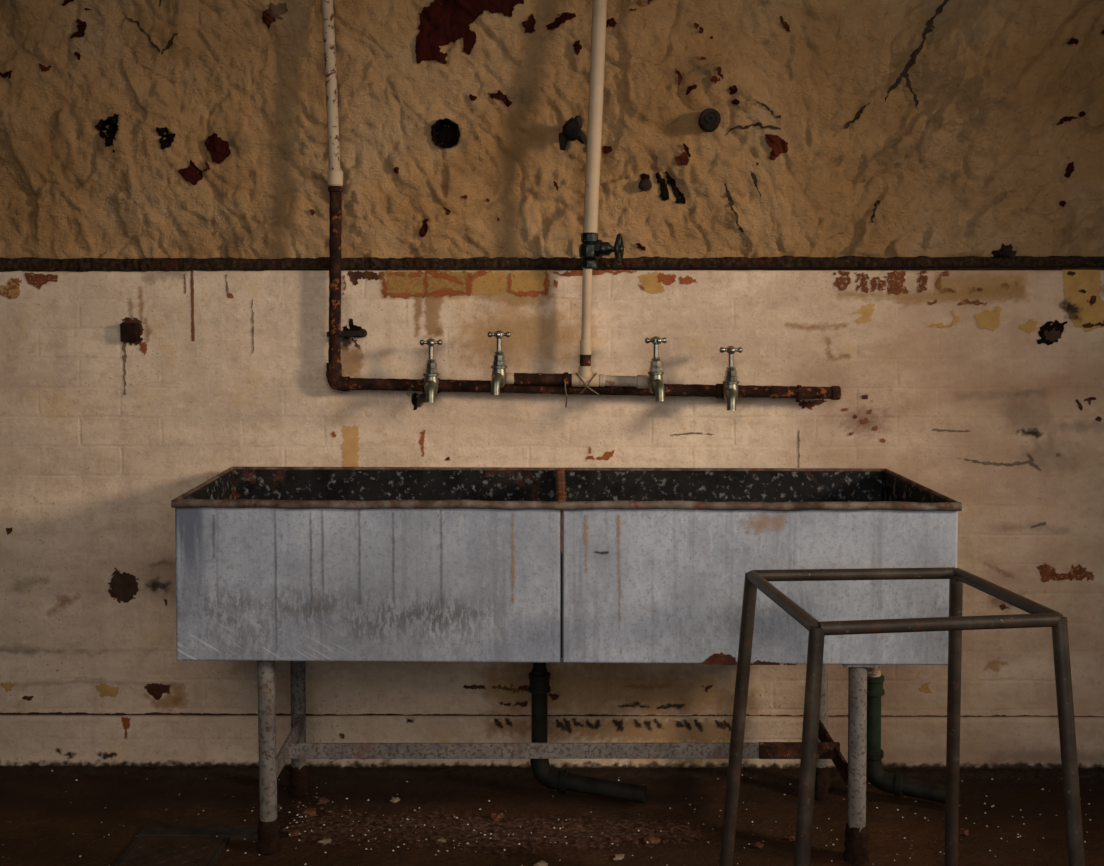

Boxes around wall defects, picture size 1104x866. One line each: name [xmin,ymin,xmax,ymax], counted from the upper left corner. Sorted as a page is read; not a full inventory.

peeling [415,0,576,64]
peeling [178,133,231,185]
peeling [0,272,58,299]
corrosion [183,271,195,341]
peeling [342,270,698,303]
peeling [833,270,1024,331]
peeling [1020,270,1104,345]
peeling [144,683,176,707]